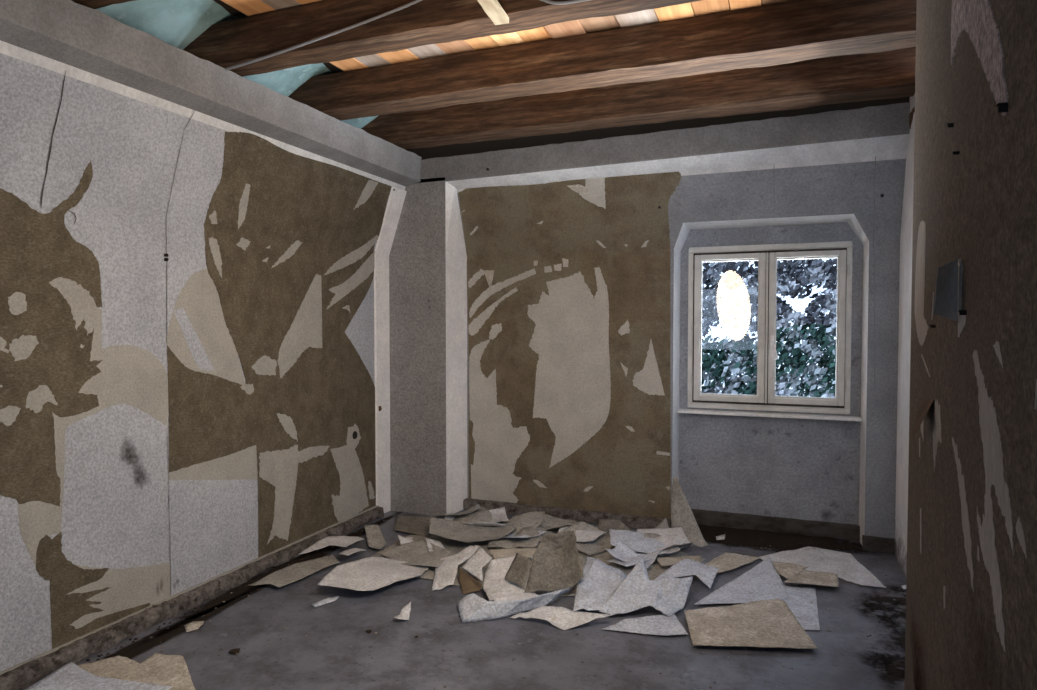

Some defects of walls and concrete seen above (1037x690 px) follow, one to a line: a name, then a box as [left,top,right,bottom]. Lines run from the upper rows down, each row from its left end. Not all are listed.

flaking render [951,0,1009,116]
peeling [236,184,250,250]
peeling [354,180,378,210]
peeling [568,177,606,209]
peeling [166,235,378,395]
peeling [0,277,169,565]
peeling [169,413,375,544]
peeling [468,258,665,503]
peeling [65,562,171,629]